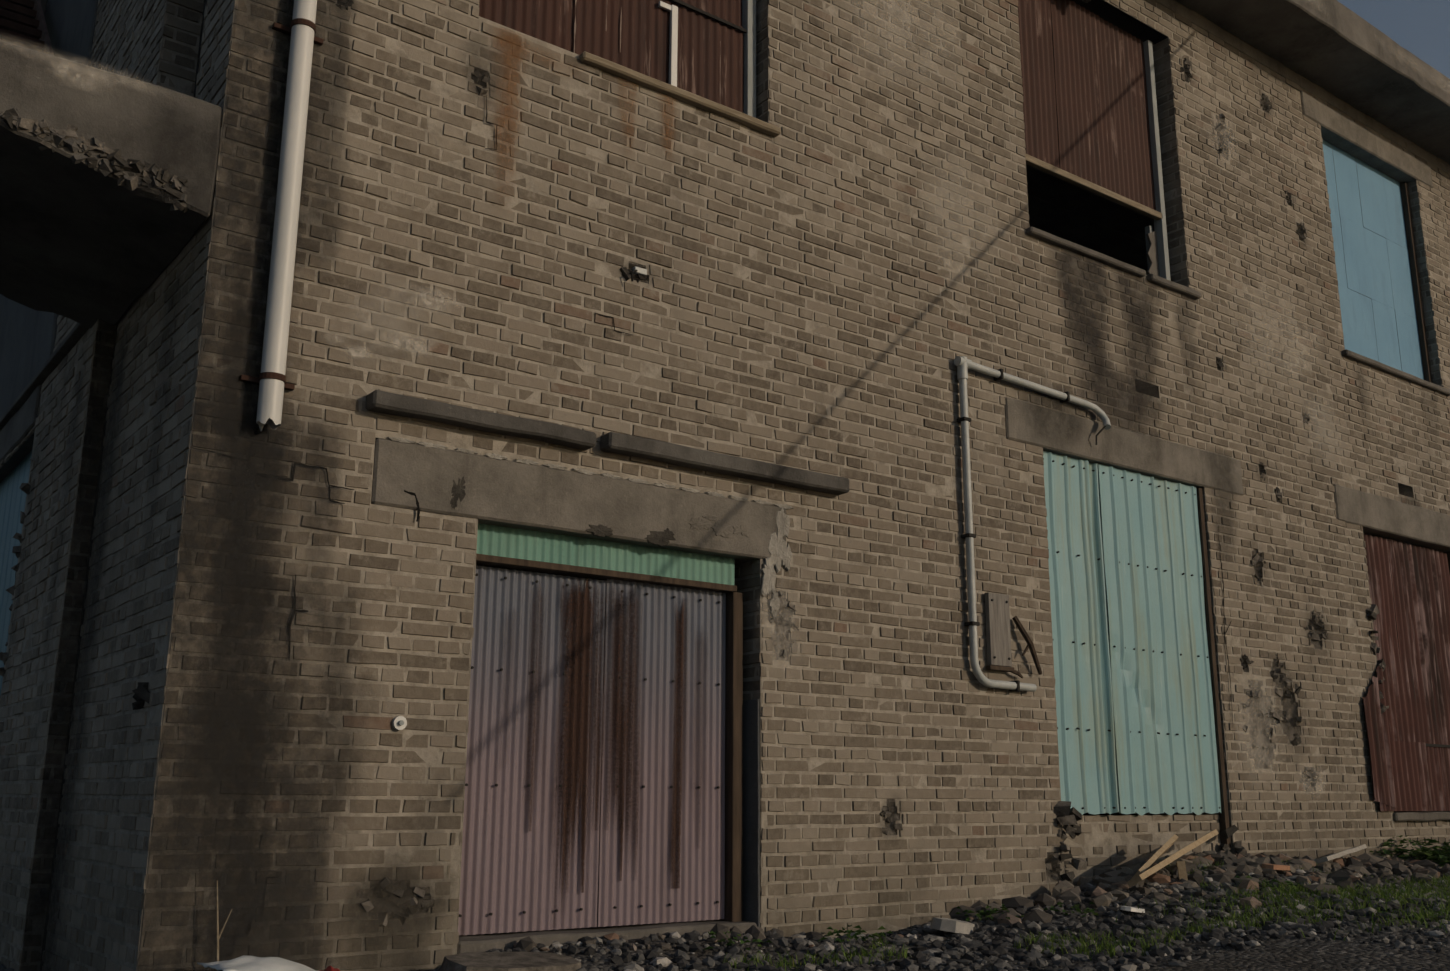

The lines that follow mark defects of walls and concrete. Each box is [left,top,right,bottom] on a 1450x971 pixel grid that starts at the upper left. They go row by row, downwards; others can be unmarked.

spalling [0,107,198,213]
damp [1059,251,1156,428]
damp [138,0,339,971]
spalling [450,476,466,509]
spalling [644,528,676,547]
peeling [761,508,796,661]
spalling [1304,610,1327,650]
rust [555,578,640,893]
rust [671,600,686,888]
spalling [1240,654,1302,769]
spalling [880,799,903,835]
spalling [356,877,435,927]